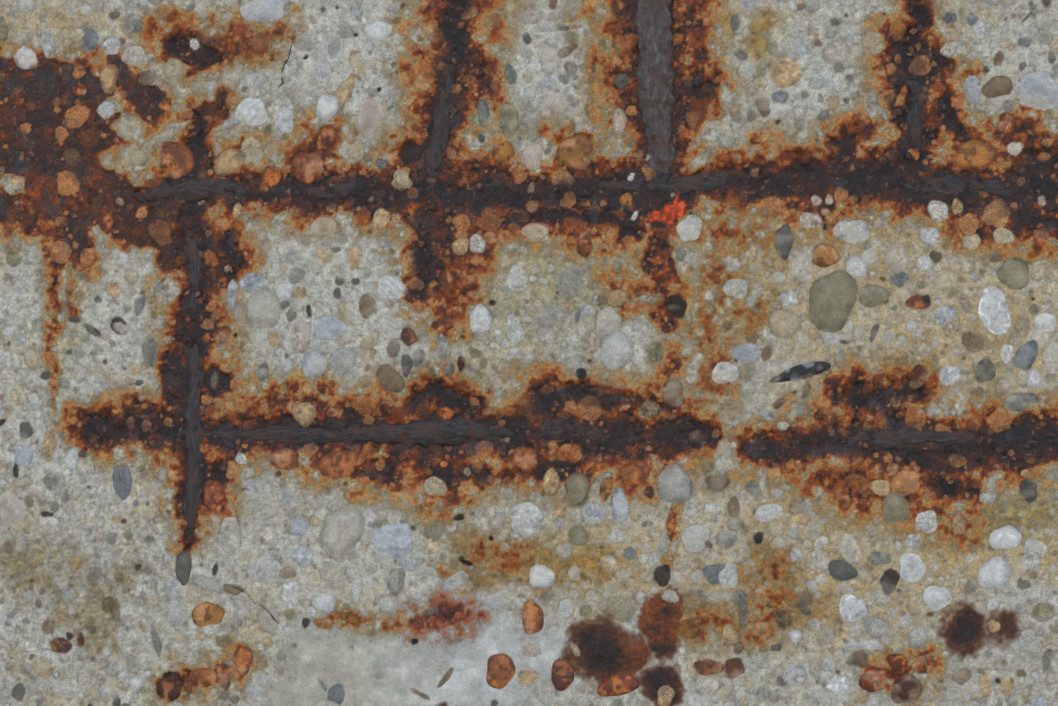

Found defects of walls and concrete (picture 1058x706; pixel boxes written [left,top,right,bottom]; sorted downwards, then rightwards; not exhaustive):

rust [0,0,437,189]
rust [454,0,641,179]
rust [675,0,912,175]
rust [908,0,1058,166]
spalling [0,0,1058,551]
rust [0,194,1058,557]
rust [143,637,267,706]
rust [326,532,554,642]
rust [662,501,684,571]
rust [563,548,805,706]
rust [855,603,1018,706]